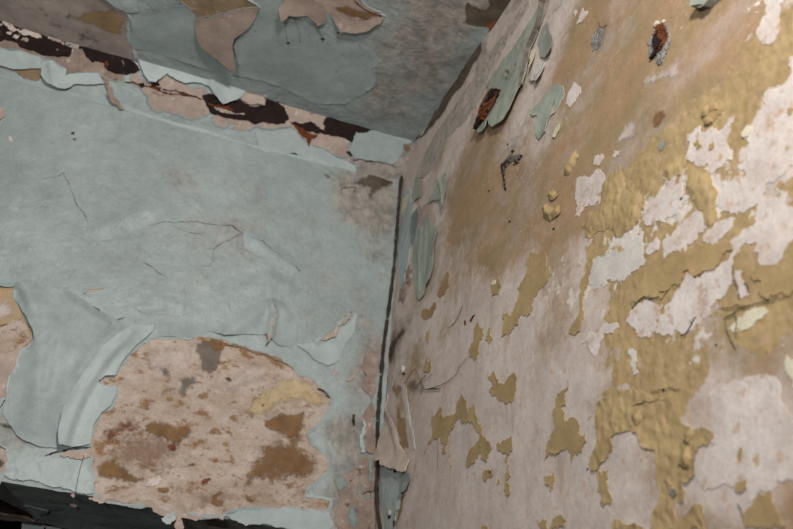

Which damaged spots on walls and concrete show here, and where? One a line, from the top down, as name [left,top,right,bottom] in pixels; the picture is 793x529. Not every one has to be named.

flaking render [279,0,387,33]
flaking render [0,0,352,159]
flaking render [400,0,530,248]
flaking render [575,56,793,357]
flaking render [0,286,34,400]
flaking render [627,348,639,375]
crack [720,265,785,347]
flaking render [784,355,793,380]
flaking render [0,444,11,483]
flaking render [87,335,379,529]
flaking render [694,374,793,503]